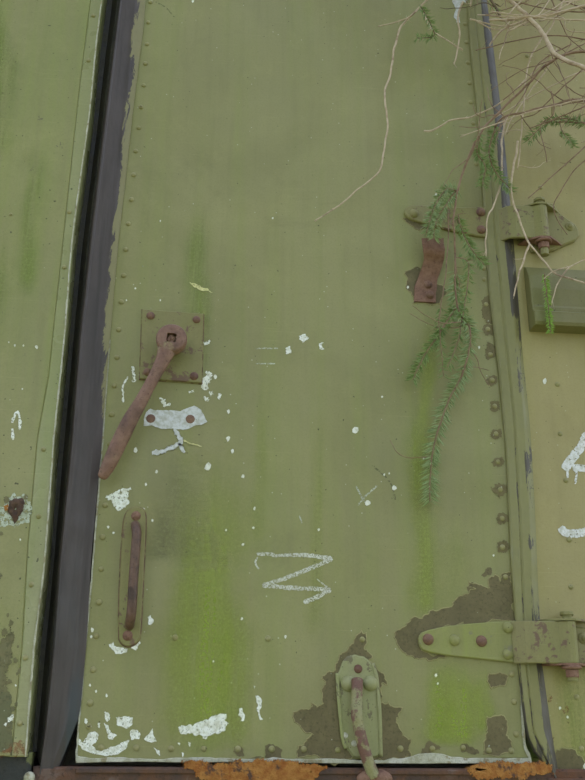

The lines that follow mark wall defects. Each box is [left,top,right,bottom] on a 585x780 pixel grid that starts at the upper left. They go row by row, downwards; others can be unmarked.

peeling [403,266,447,306]
peeling [144,371,222,455]
corrosion [0,493,32,527]
peeling [393,567,515,662]
peeling [0,613,21,752]
peeling [292,630,441,766]
peeling [79,712,160,756]
peeling [178,713,228,757]
peeling [460,714,513,757]
corrosion [181,758,328,780]
corrosion [466,758,556,780]